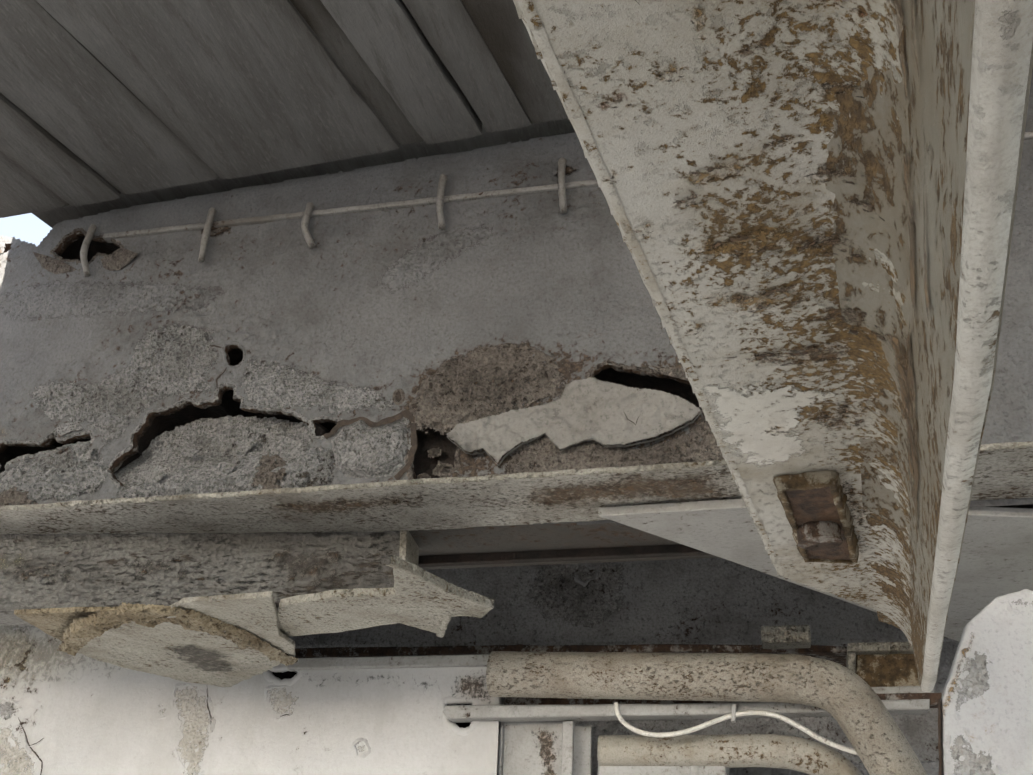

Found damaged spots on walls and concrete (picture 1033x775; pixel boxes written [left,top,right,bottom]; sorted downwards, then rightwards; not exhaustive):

corrosion [674,156,743,208]
spalling [33,231,138,274]
corrosion [704,284,809,312]
spalling [225,345,243,366]
corrosion [727,342,846,366]
corrosion [804,152,919,533]
peeling [0,364,835,505]
corrosion [505,416,726,510]
peeling [0,696,38,775]
peeling [170,682,216,775]
corrosion [531,730,557,775]
peeling [943,649,1008,775]